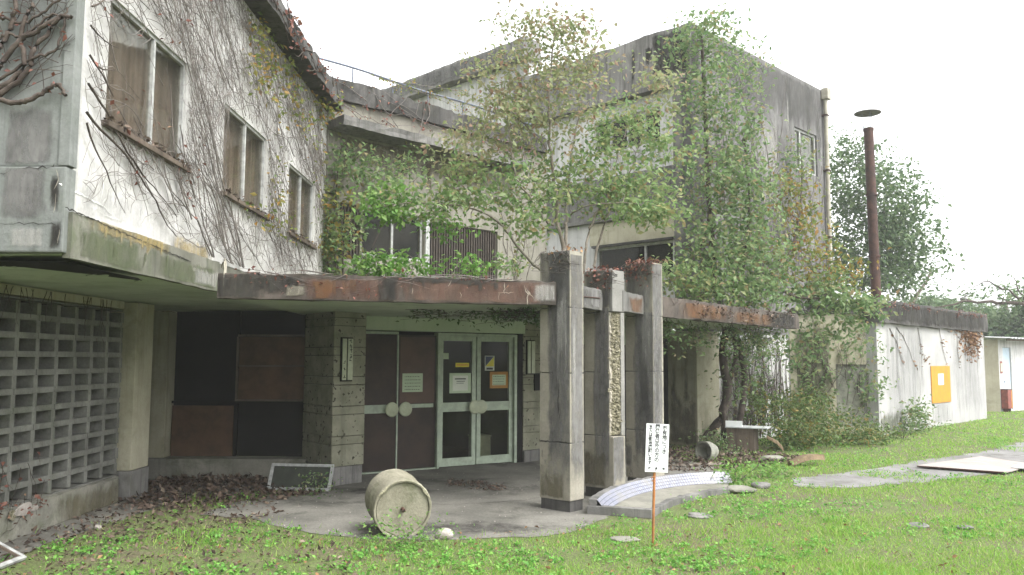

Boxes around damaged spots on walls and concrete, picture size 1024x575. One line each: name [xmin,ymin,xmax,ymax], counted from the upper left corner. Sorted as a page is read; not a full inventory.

damp [3,110,50,215]
damp [100,222,206,265]
corrosion [395,280,539,303]